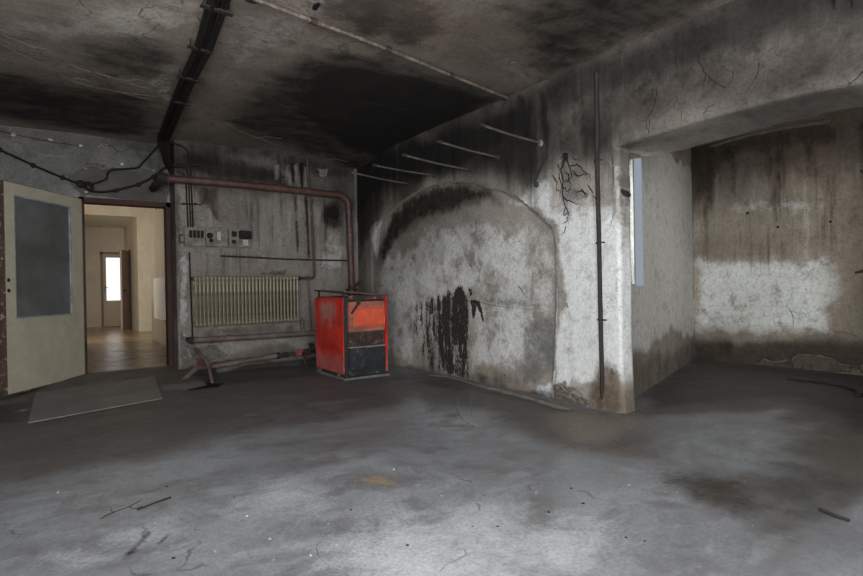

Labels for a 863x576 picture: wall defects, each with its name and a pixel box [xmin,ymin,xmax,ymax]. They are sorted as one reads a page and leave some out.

crack [0,33,155,99]
crack [675,53,760,116]
crack [552,155,631,236]
spalling [376,180,597,406]
spalling [758,354,863,374]